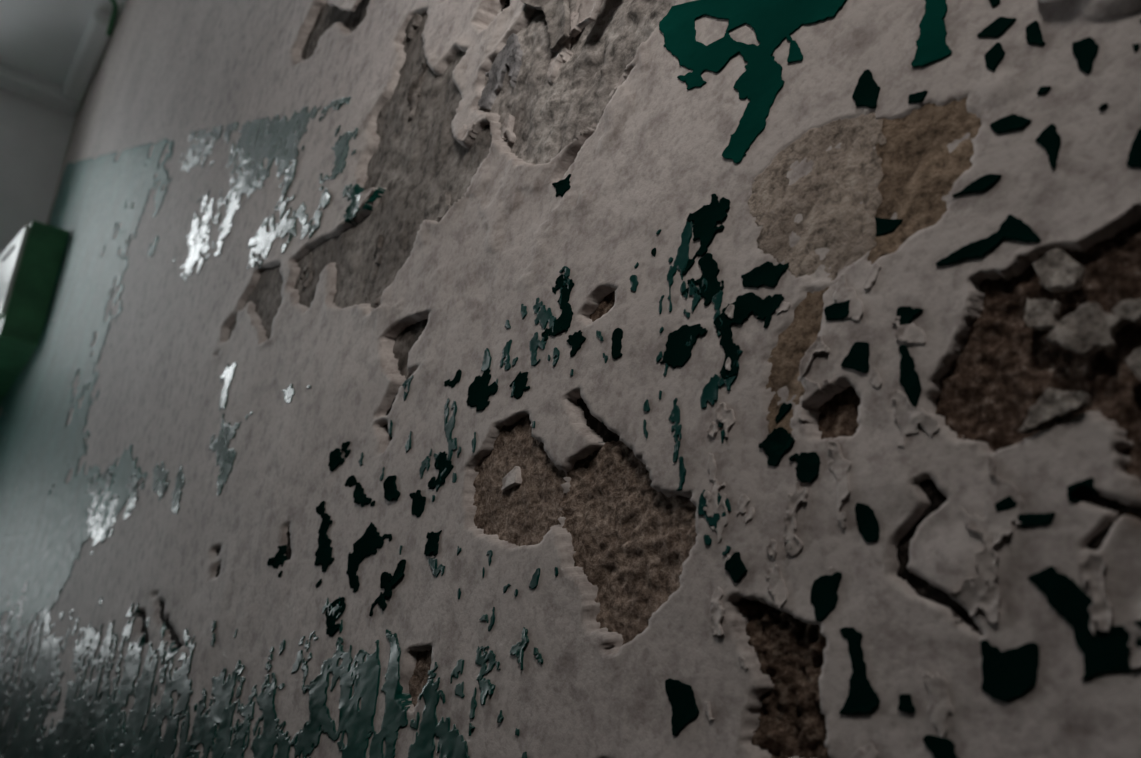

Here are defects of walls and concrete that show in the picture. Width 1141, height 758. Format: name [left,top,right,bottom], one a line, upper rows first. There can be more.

peeling [911,0,952,68]
peeling [977,0,1046,72]
peeling [1072,37,1099,75]
peeling [1035,124,1061,170]
peeling [1126,128,1141,168]
peeling [0,0,847,758]
spalling [328,69,1040,758]
spalling [841,214,1141,624]
peeling [1028,550,1141,681]